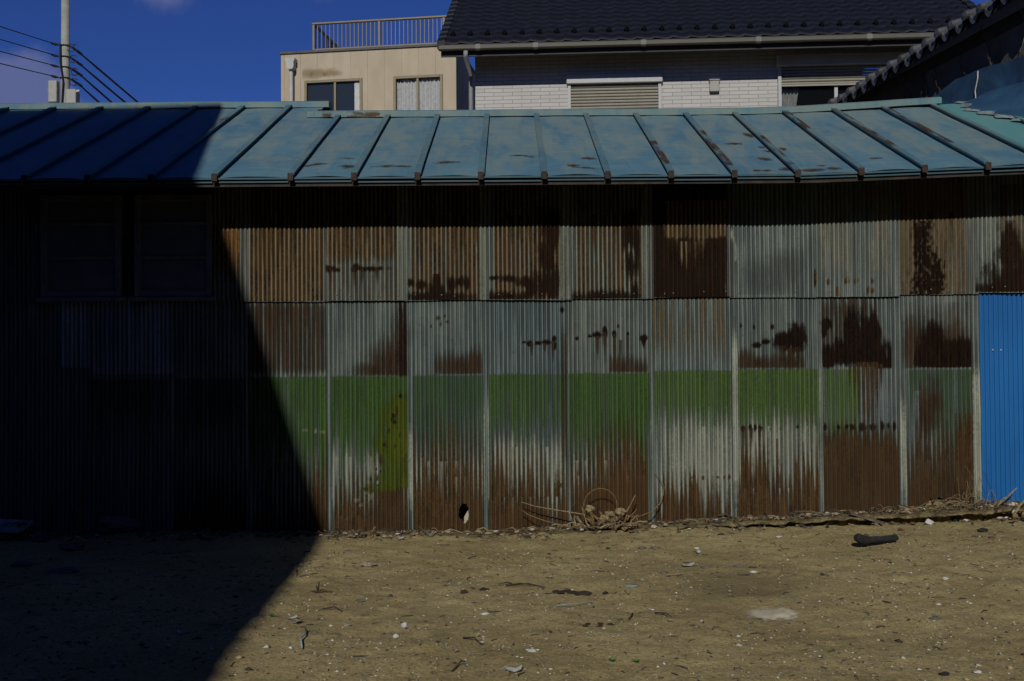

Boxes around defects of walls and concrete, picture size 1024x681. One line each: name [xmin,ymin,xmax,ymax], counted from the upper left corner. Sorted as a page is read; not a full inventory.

rust [215,183,975,532]
rust [898,177,1024,294]